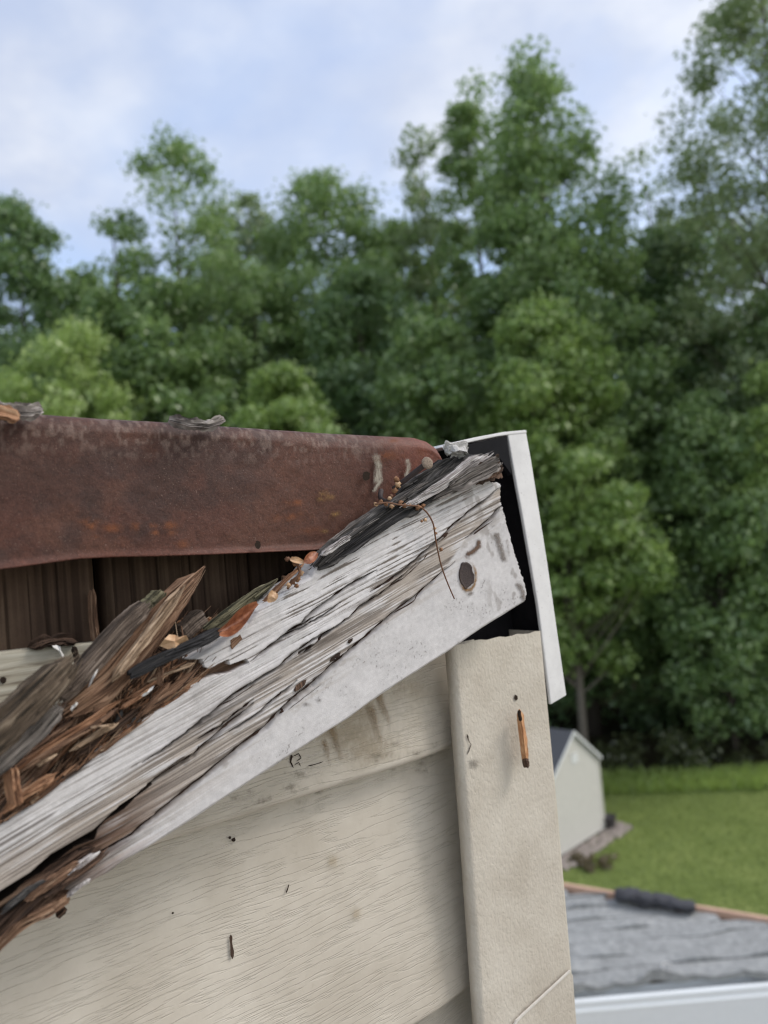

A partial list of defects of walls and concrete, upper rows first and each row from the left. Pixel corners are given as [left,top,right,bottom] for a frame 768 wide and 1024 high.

peeling [53,645,79,662]